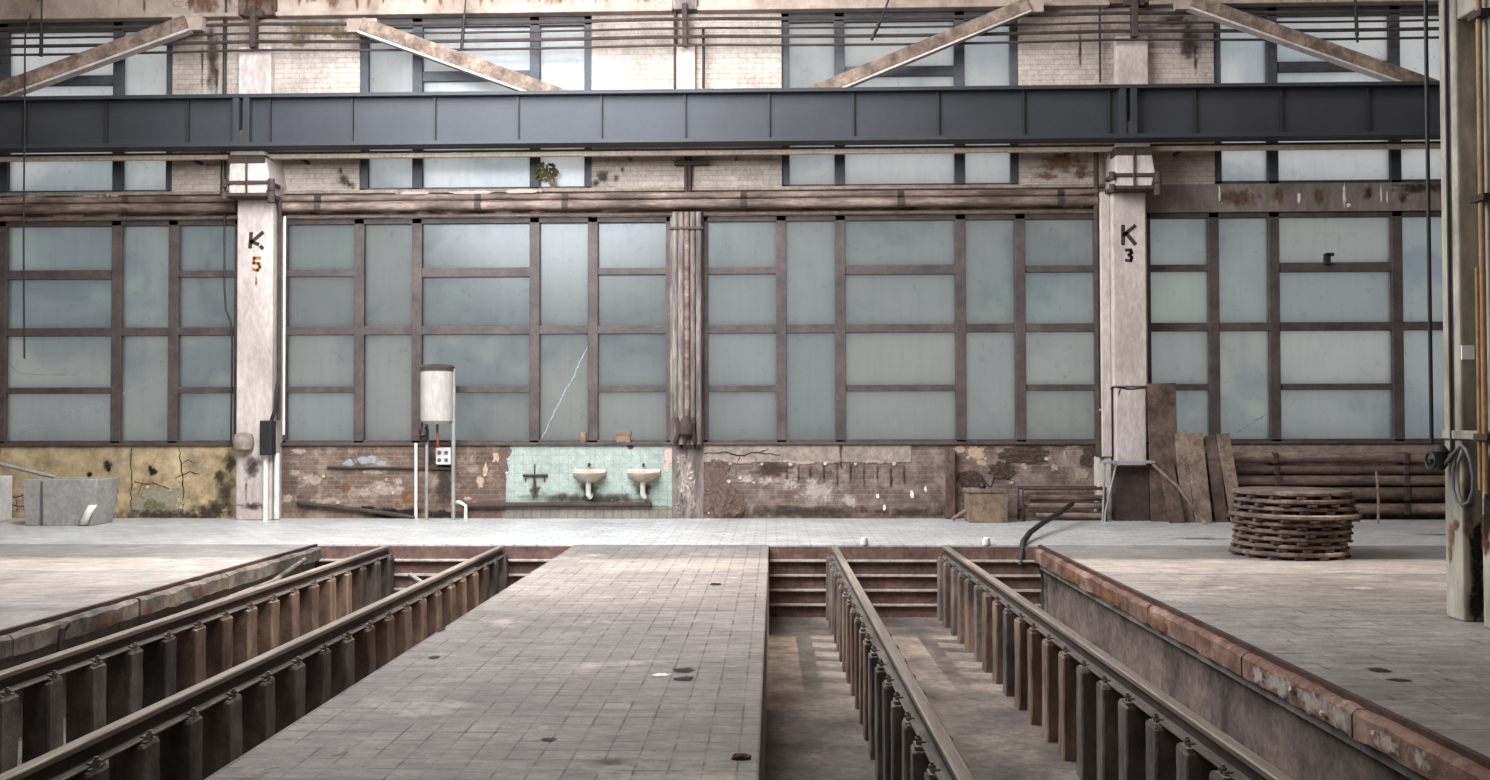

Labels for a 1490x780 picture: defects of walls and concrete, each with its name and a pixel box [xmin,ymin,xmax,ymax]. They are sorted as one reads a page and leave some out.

damp [128,454,263,518]
spalling [663,447,835,519]
spalling [954,407,1104,488]
corrosion [1481,456,1490,555]